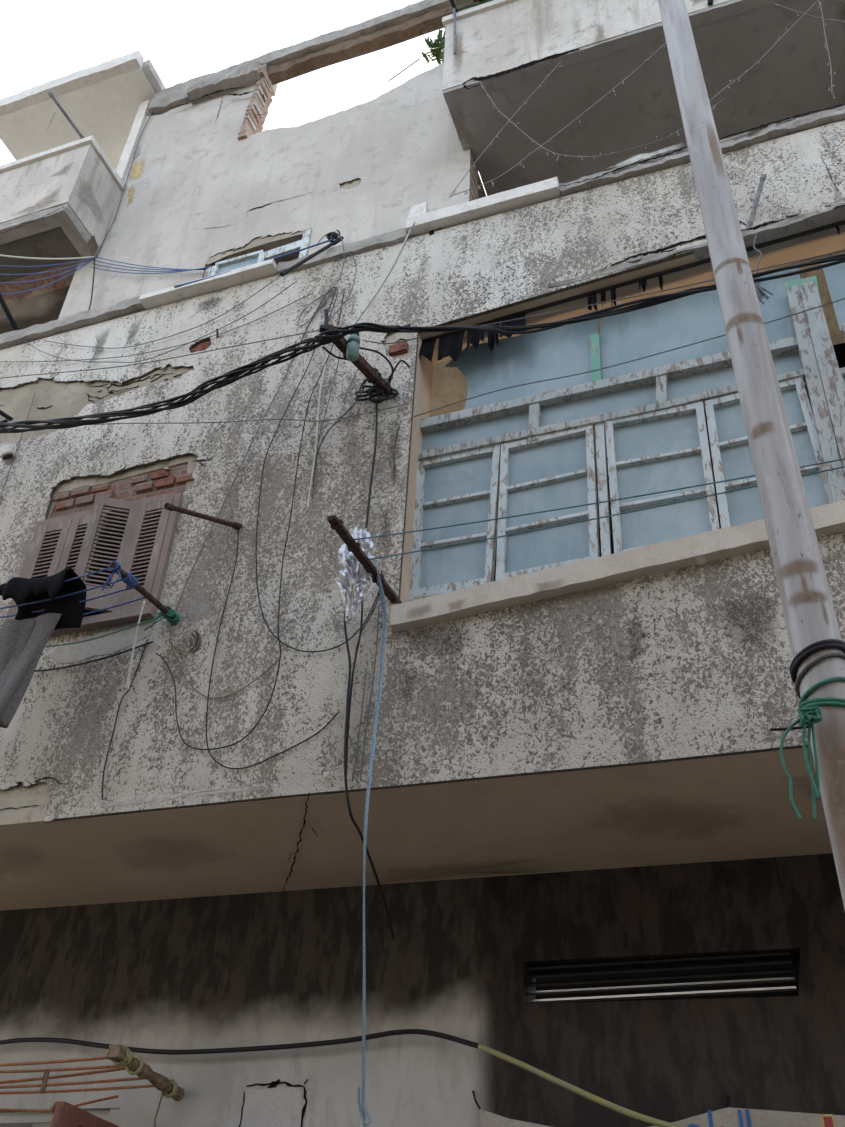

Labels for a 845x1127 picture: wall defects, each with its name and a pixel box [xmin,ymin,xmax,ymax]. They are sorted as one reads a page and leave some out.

spalling [186,61,272,140]
spalling [205,228,312,265]
spalling [190,338,212,353]
spalling [0,365,194,444]
spalling [50,453,194,518]
spalling [0,781,55,826]
crack [283,793,318,892]